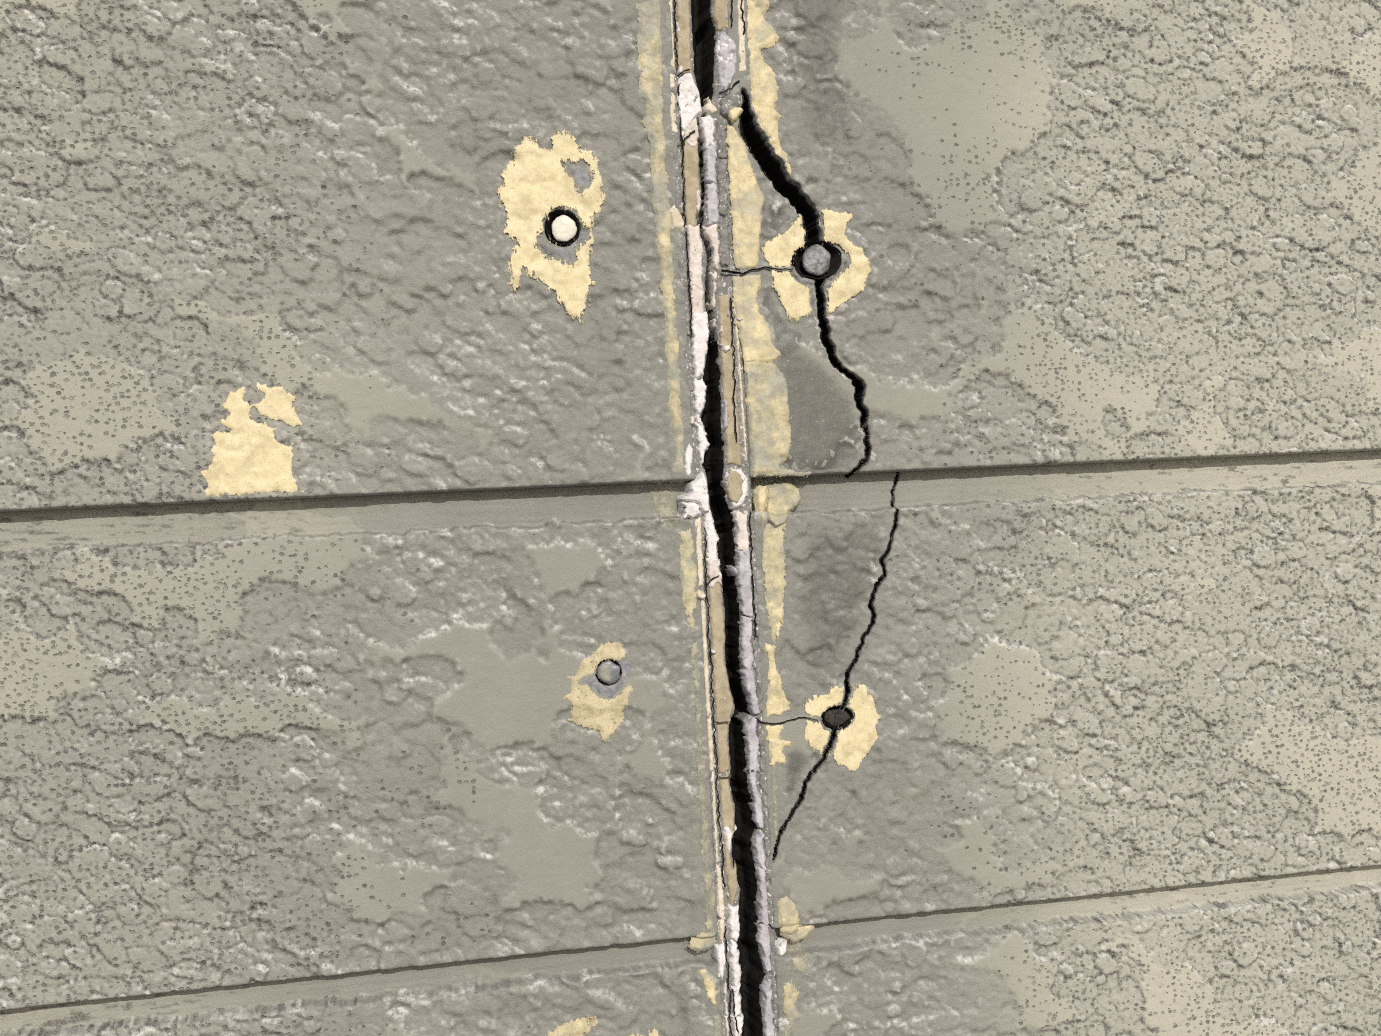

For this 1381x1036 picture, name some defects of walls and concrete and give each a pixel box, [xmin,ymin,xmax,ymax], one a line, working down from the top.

water stain [762,198,790,235]
spalling [542,232,587,261]
spalling [792,251,848,307]
water stain [764,296,853,470]
peeling [676,10,787,1036]
crack [674,0,900,1036]
spalling [582,661,632,698]